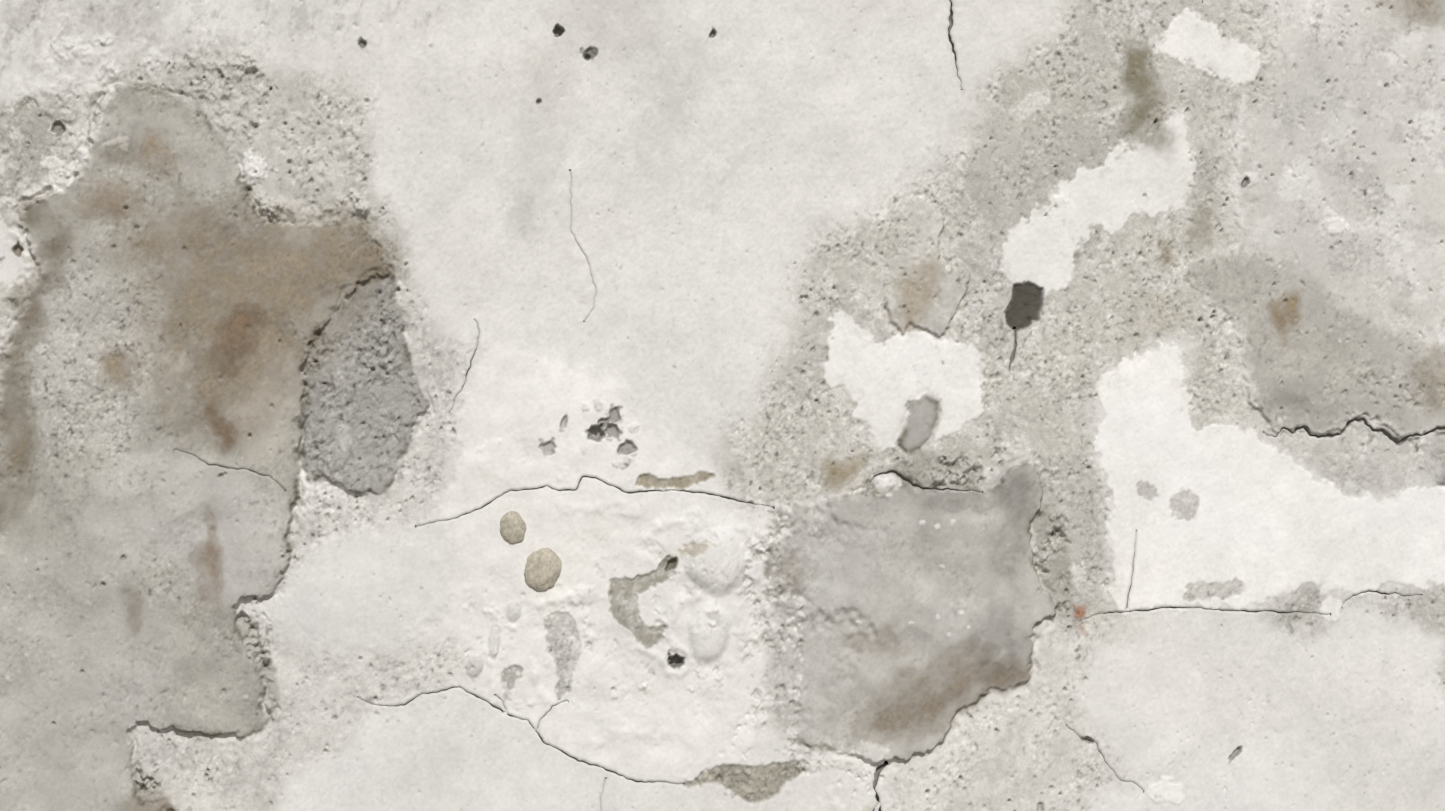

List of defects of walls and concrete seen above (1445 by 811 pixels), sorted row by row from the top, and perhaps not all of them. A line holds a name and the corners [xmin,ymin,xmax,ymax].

crack [945,0,964,90]
leakage [132,211,381,414]
spalling [0,38,472,811]
peeling [636,0,1445,811]
crack [1263,414,1445,449]
crack [416,473,774,529]
crack [863,467,982,496]
crack [1079,531,1421,623]
crack [356,684,685,811]
crack [870,761,889,811]
crack [1064,724,1145,793]